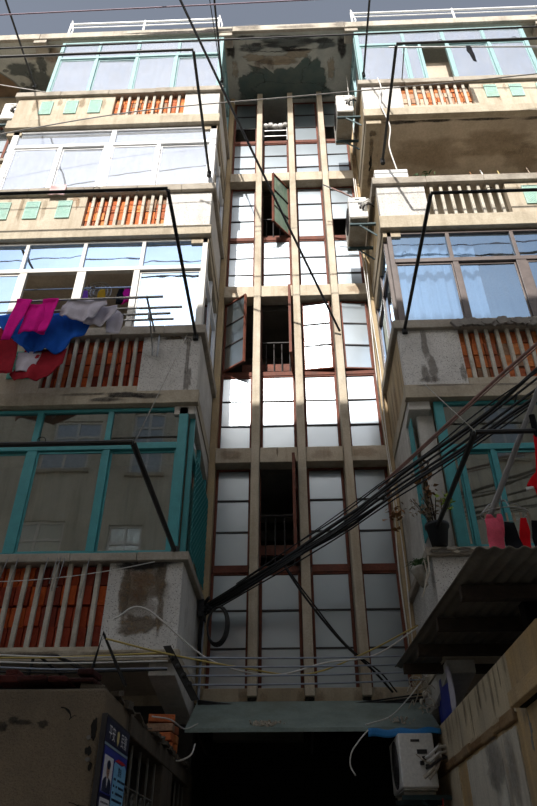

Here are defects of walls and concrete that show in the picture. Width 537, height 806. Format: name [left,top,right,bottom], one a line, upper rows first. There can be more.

damp [8,57,50,93]
damp [126,25,346,100]
damp [421,333,466,386]
damp [118,562,171,635]